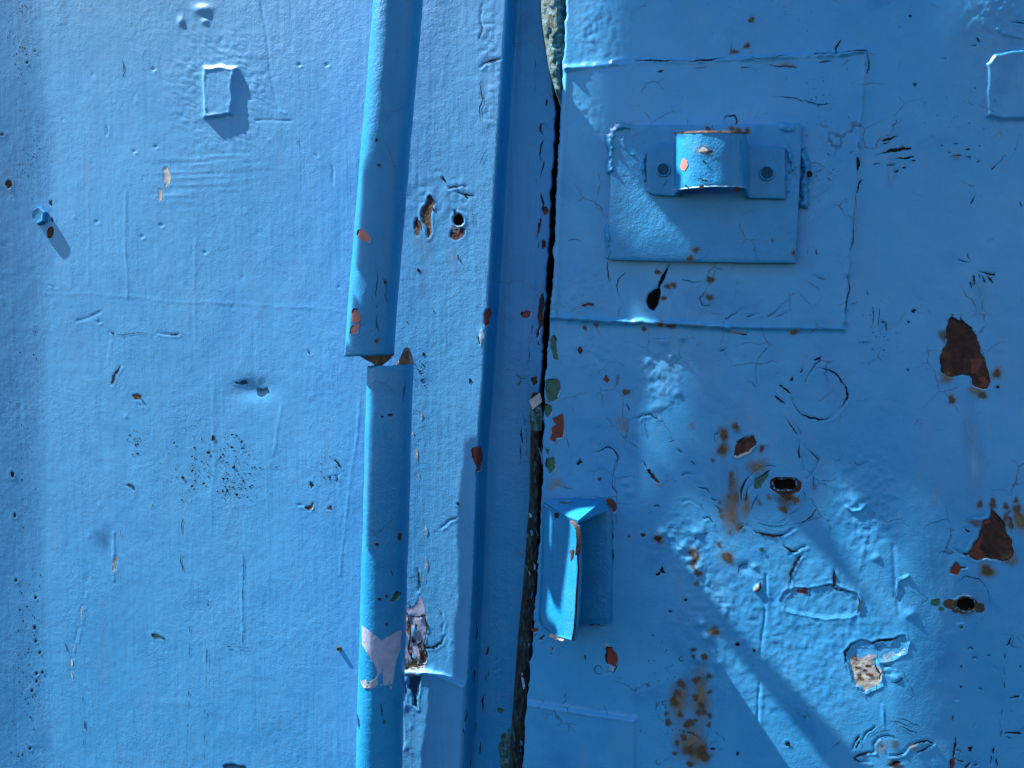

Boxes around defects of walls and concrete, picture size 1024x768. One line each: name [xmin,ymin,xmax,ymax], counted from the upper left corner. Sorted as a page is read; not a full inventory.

crack [636,17,870,249]
peeling [158,167,171,201]
peeling [414,195,434,239]
crack [537,194,580,249]
crack [682,272,791,320]
corrosion [940,314,1000,398]
peeling [517,375,564,473]
crack [775,357,849,434]
corrosion [956,498,1024,575]
peeling [361,591,428,707]
peeling [844,635,908,692]
corrosion [665,674,716,767]